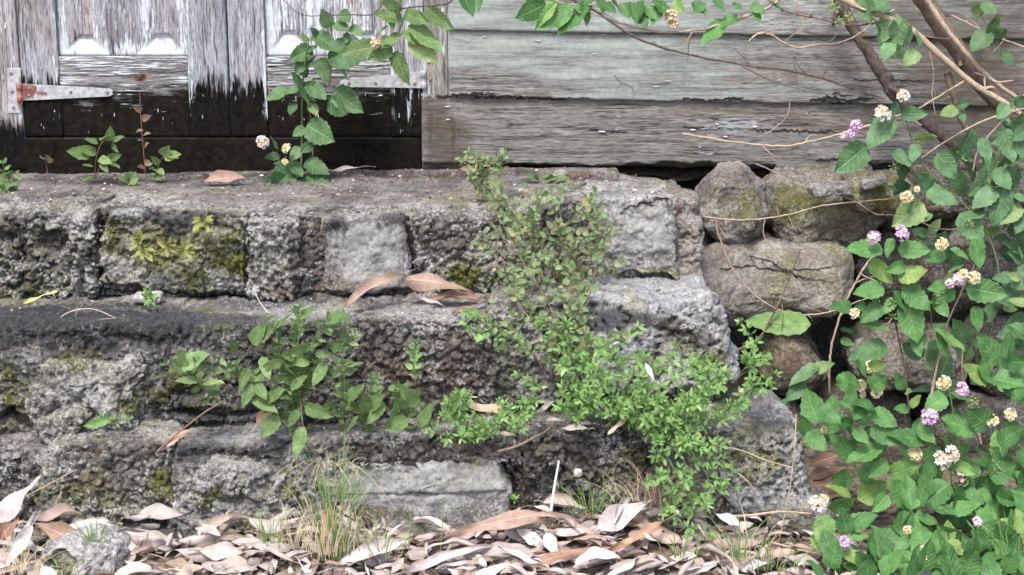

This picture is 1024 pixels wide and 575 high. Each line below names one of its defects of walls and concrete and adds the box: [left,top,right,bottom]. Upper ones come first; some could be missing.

peeling [33,0,206,102]
rust [18,76,47,109]
crack [721,255,848,305]